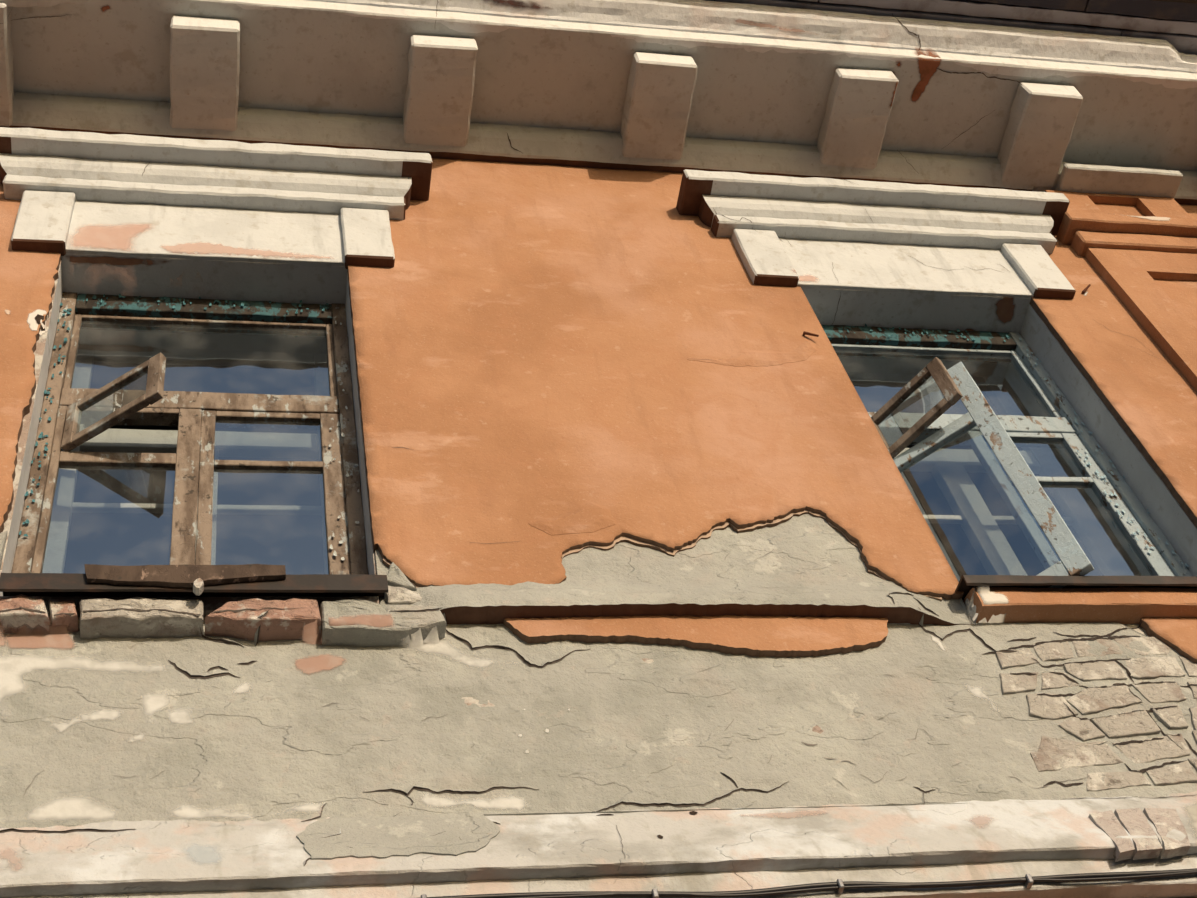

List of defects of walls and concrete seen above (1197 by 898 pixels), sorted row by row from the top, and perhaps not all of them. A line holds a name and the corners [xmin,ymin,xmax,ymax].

corrosion [911,50,941,102]
crack [892,13,1023,86]
crack [0,607,306,679]
crack [399,608,589,668]
flaking render [0,513,1197,862]
crack [0,826,129,834]
crack [301,804,352,866]
crack [369,785,539,817]
crack [592,755,789,855]
crack [802,742,962,805]